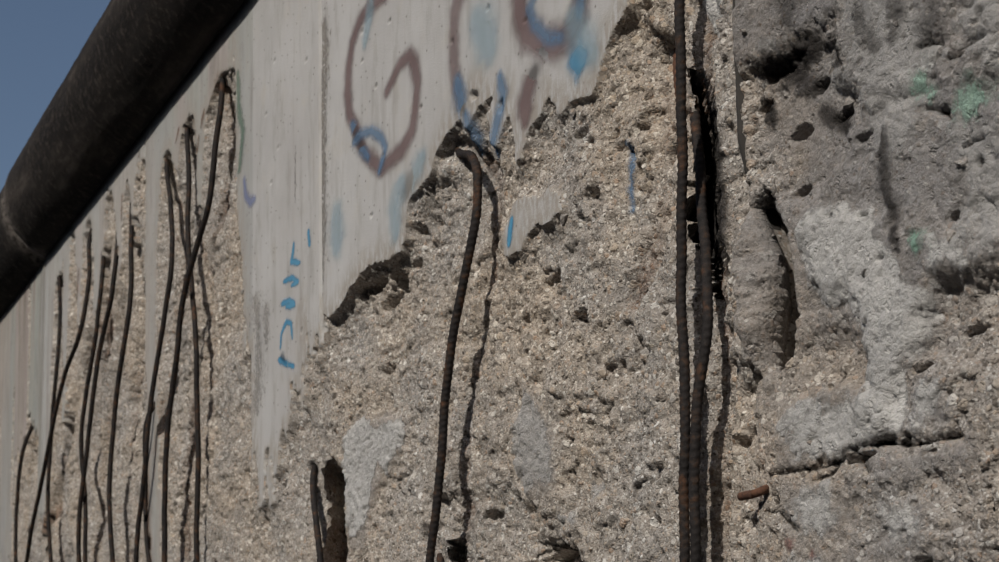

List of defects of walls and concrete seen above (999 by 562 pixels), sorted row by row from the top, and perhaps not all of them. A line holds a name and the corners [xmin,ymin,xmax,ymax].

spalling [10,0,724,562]
spalling [684,0,999,562]